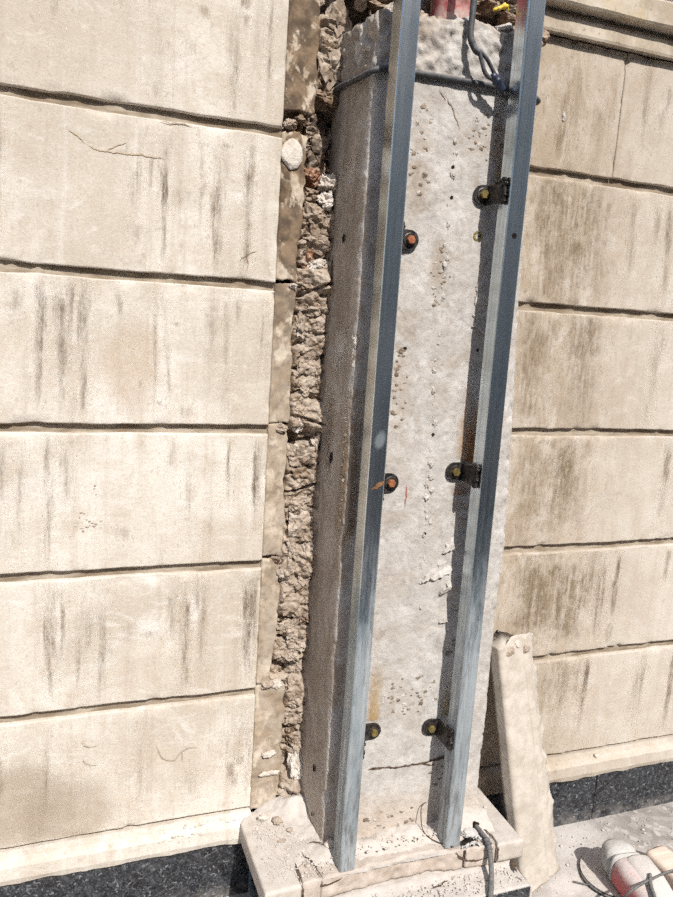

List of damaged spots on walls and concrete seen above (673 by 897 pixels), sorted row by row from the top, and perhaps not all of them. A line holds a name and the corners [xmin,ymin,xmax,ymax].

crack [68,129,161,158]
spalling [249,0,355,812]
corrosion [466,430,475,462]
spalling [421,491,470,595]
leakage [528,568,591,628]
crack [368,755,445,770]